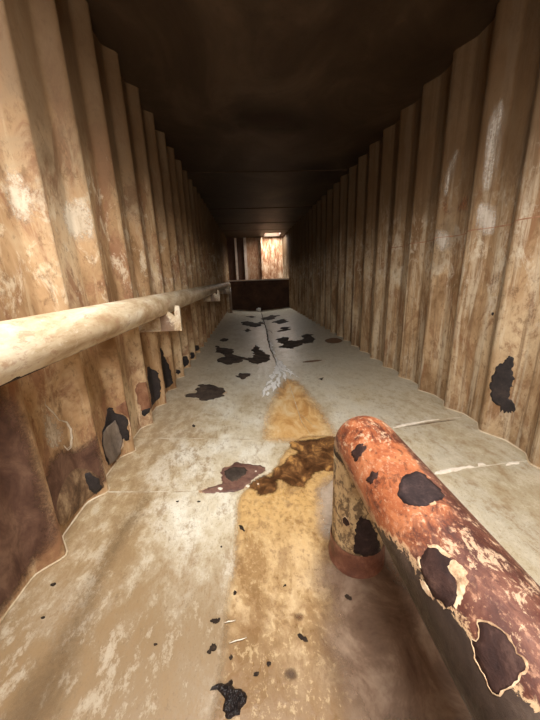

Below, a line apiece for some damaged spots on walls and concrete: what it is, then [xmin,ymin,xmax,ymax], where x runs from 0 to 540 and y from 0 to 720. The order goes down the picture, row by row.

efflorescence [477,205,496,233]
peeling [102,345,200,465]
peeling [185,384,227,401]
peeling [215,338,271,365]
peeling [241,315,315,349]
crack [261,313,316,435]
peeling [489,356,516,413]
peeling [198,462,265,494]
corrosion [214,379,353,720]
peeling [443,560,469,609]